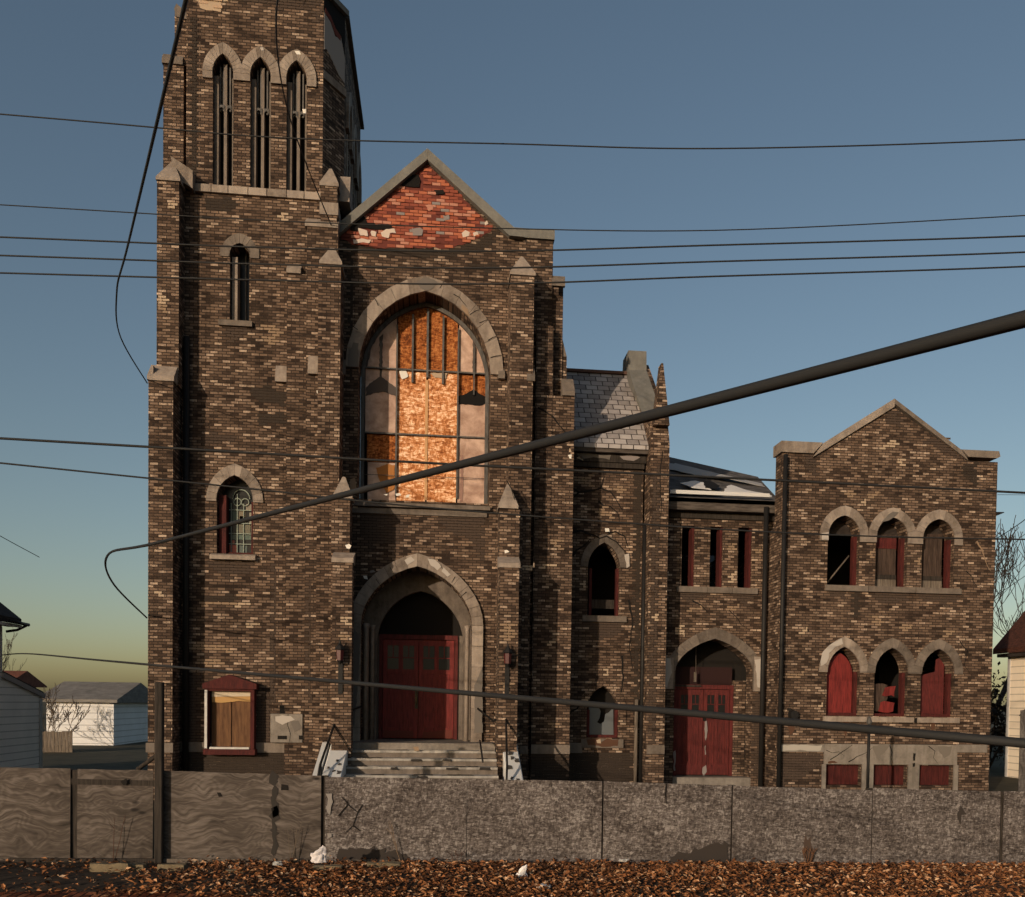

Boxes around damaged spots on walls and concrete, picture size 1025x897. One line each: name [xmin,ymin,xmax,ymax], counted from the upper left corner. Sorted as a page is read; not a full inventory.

spalling [196,0,228,12]
spalling [341,164,493,249]
crack [826,745,893,763]